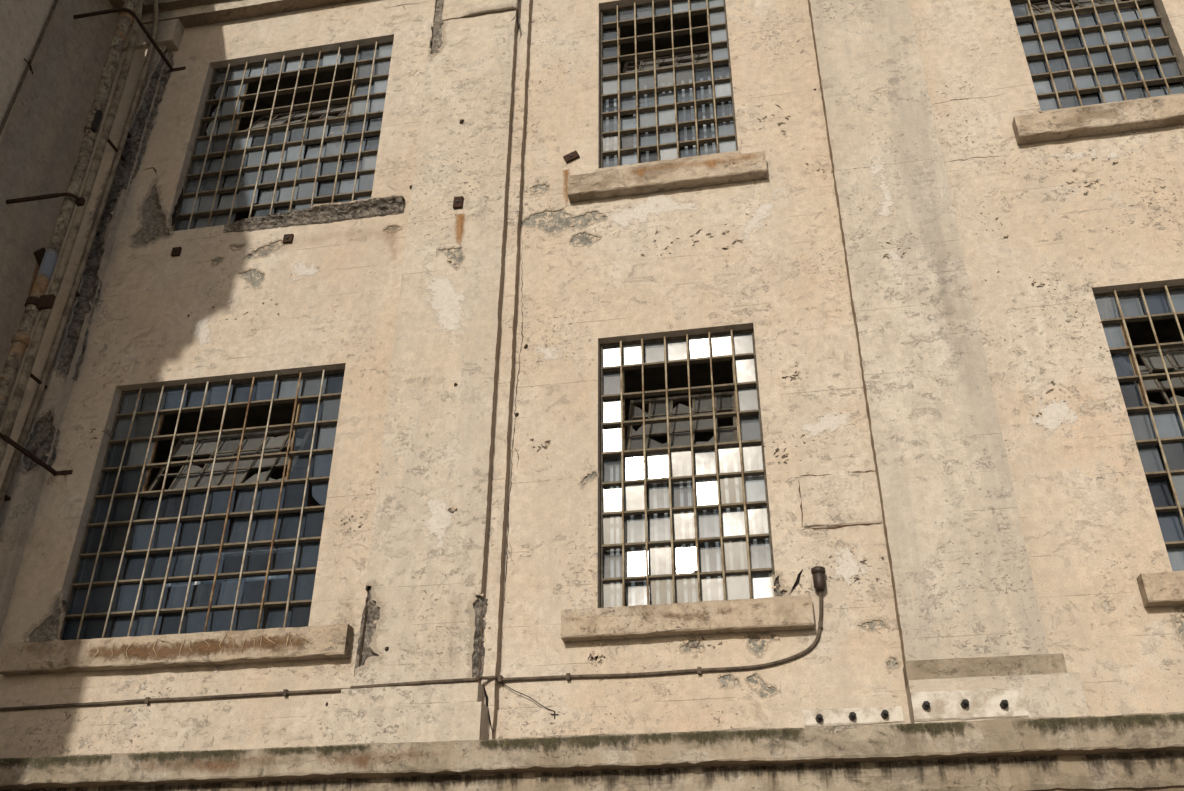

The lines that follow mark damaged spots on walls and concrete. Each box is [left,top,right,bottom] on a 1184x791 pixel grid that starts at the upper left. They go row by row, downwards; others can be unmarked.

spalling [428,0,447,57]
spalling [53,45,174,381]
spalling [130,180,183,247]
peeling [521,208,607,247]
corrosion [90,635,303,660]
spalling [354,582,384,676]
spalling [467,592,488,682]
damp [580,734,664,747]
damp [900,722,963,734]
damp [394,773,517,789]
damp [536,768,681,789]
damp [704,762,860,783]